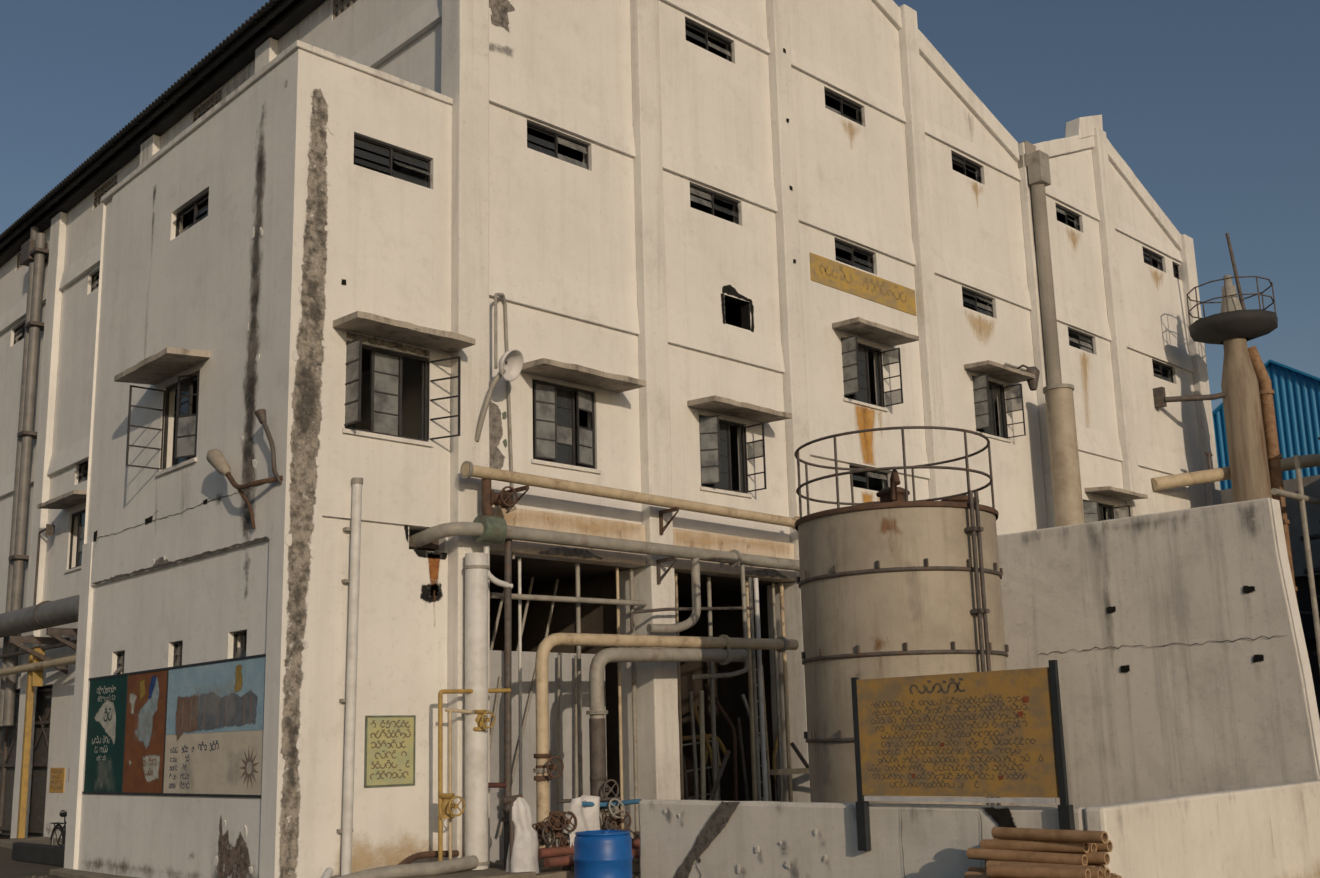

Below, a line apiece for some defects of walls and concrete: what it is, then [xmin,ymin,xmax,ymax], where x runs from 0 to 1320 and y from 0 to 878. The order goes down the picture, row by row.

spalling [489,0,515,32]
corrosion [856,405,875,465]
peeling [279,89,336,878]
flaking render [214,817,252,878]